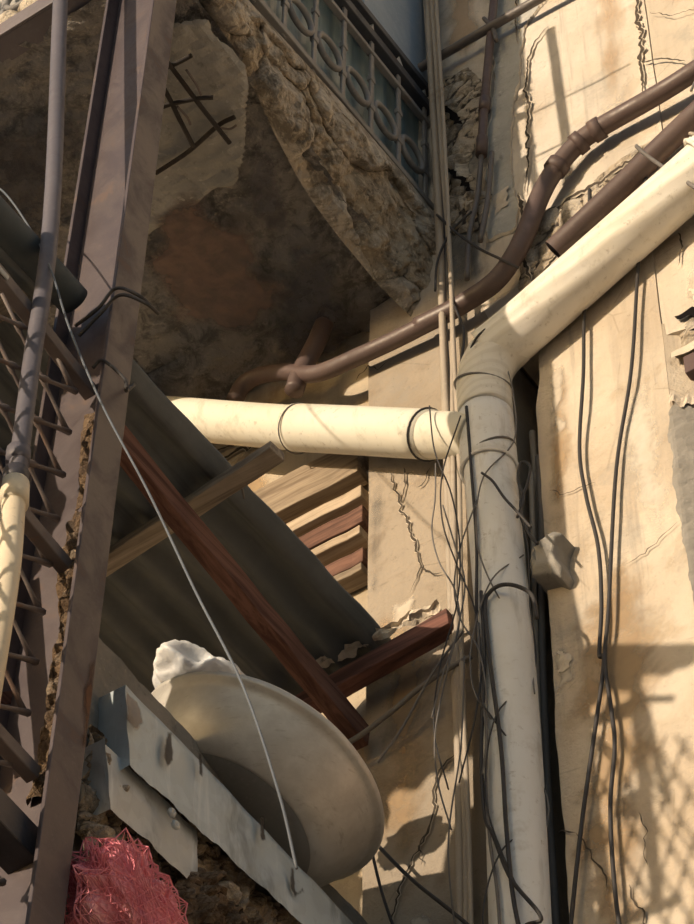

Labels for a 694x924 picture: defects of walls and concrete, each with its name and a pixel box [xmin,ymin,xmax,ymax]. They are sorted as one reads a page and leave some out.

spalling [156,53,237,175]